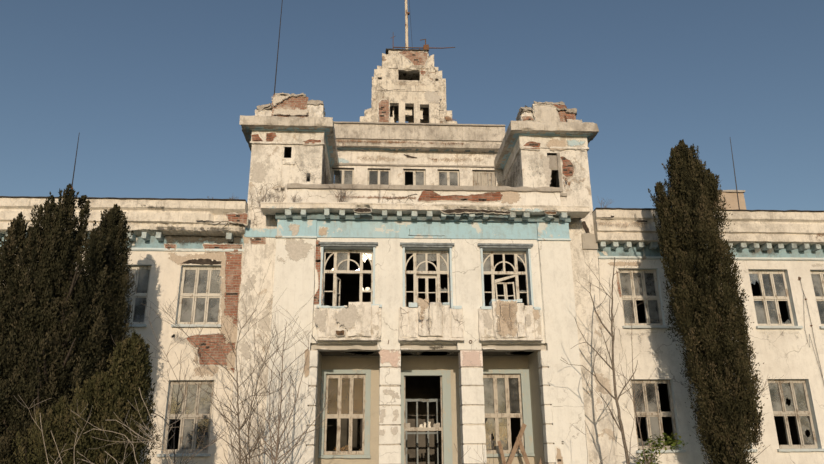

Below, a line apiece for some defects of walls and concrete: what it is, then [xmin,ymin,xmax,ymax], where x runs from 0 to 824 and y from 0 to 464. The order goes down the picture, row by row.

flaking render [377,99,390,122]
flaking render [520,137,585,185]
flaking render [417,190,521,215]
flaking render [164,213,273,377]
peeling [276,223,360,336]
peeling [482,299,540,337]
peeling [379,349,402,368]